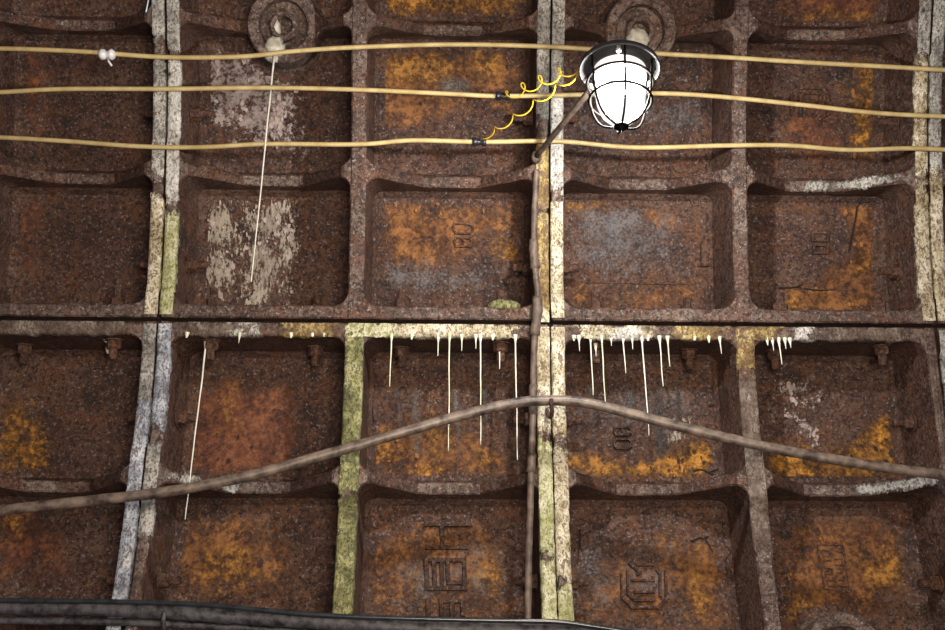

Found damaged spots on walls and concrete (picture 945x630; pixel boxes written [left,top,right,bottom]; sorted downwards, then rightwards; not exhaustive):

rust [385,50,518,128]
rust [385,202,514,268]
leakage [535,0,656,621]
rust [195,381,293,475]
rust [376,415,506,476]
rust [568,441,714,477]
leakage [670,326,906,561]
rust [771,415,894,477]
rust [181,512,286,598]
rust [375,523,501,615]
rust [581,533,725,625]
rust [782,517,906,619]